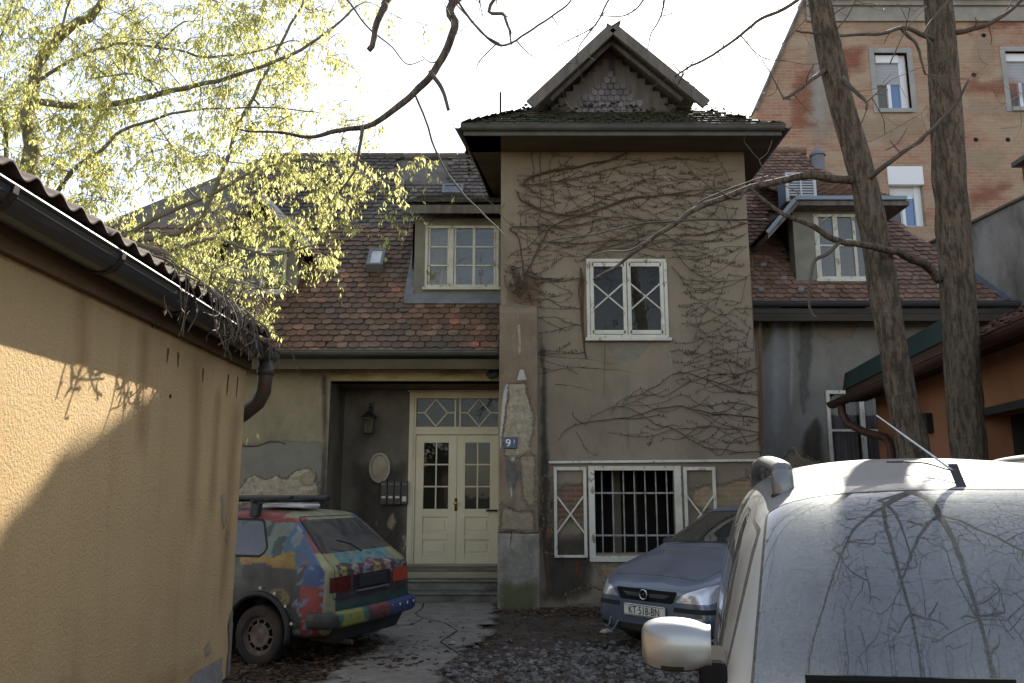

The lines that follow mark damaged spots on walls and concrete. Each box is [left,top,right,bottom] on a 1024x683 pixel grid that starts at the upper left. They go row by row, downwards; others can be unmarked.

leakage [768,322,812,444]
flaking render [498,369,596,555]
leakage [804,421,822,464]
flaking render [238,467,320,507]
flaking render [690,469,753,513]